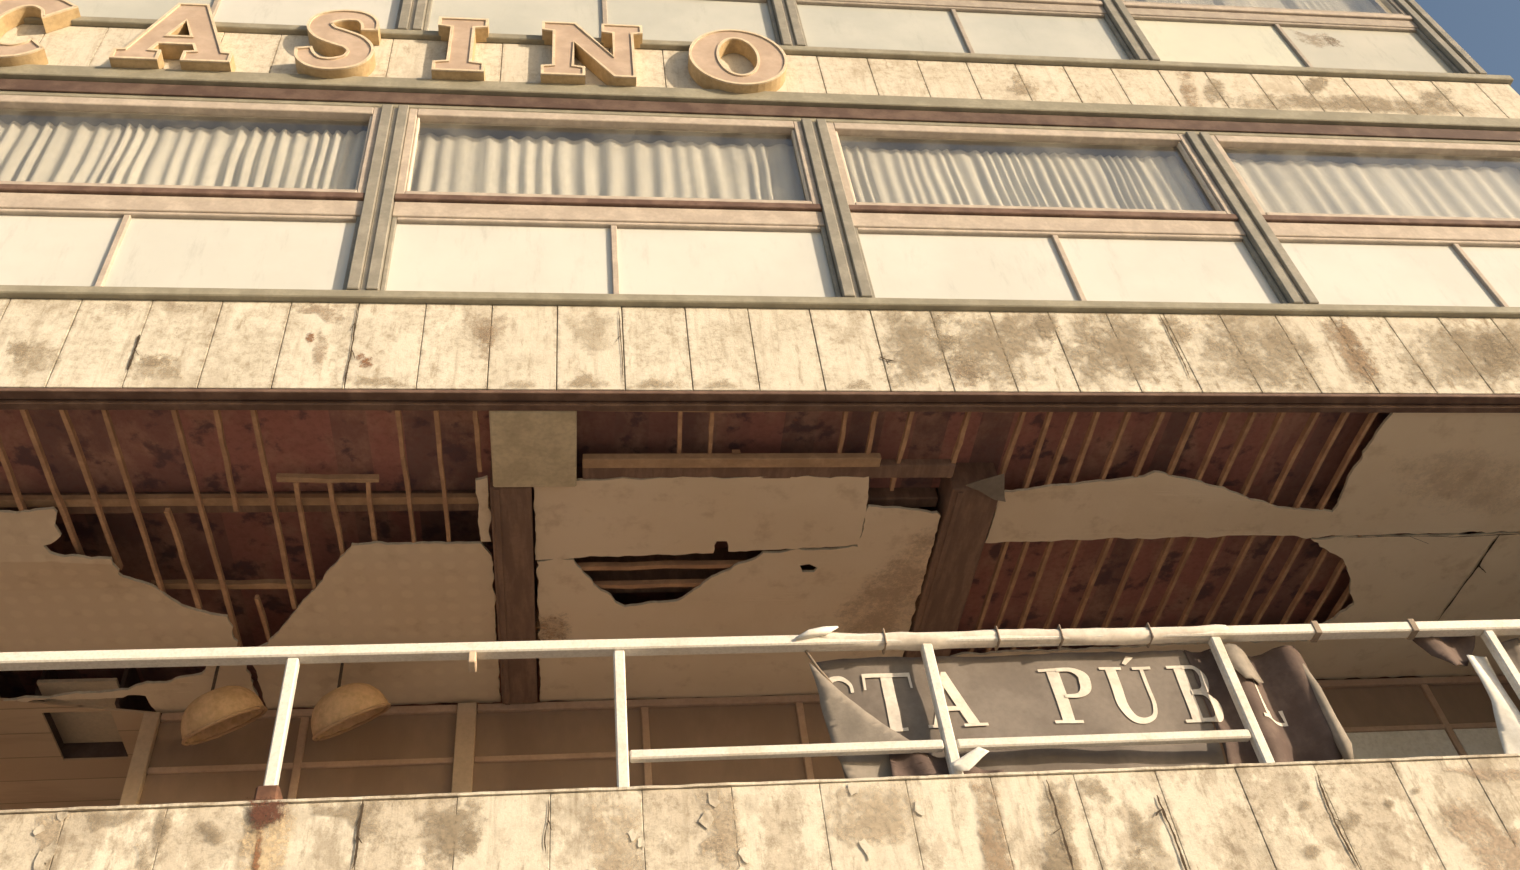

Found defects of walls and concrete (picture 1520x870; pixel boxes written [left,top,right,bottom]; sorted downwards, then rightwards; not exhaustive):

damp [1177,73,1222,107]
damp [1240,78,1466,114]
damp [570,374,608,388]
damp [888,313,1315,390]
damp [1322,321,1377,382]
damp [1409,326,1520,386]
crack [1352,534,1515,619]
damp [88,812,171,870]
damp [199,823,222,844]
corrosion [242,798,291,870]
damp [426,800,480,868]
damp [1041,779,1111,870]